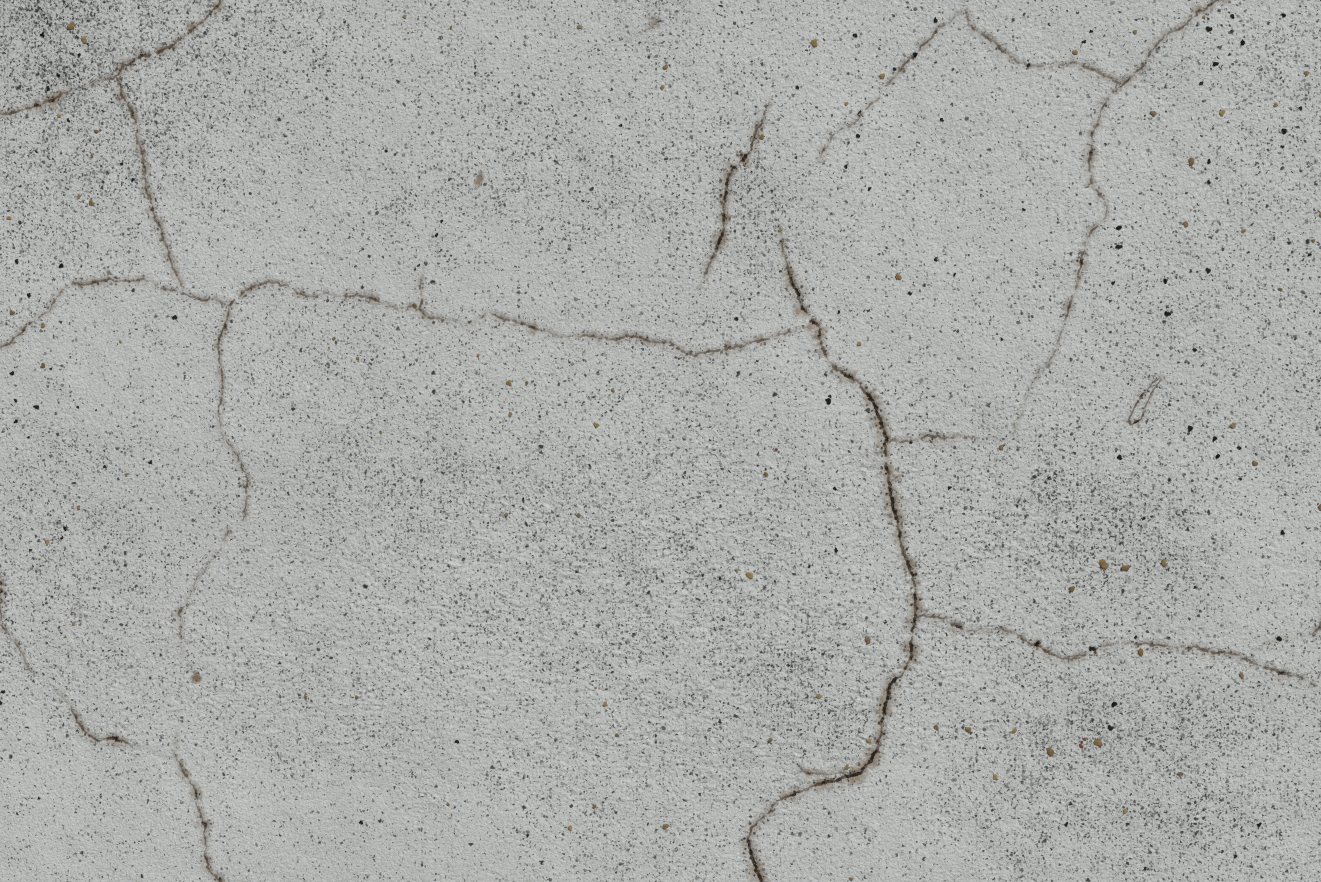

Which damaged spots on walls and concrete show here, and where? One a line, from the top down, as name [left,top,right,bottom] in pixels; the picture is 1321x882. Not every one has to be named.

crack [859,30,937,117]
crack [0,0,308,405]
crack [704,111,765,274]
crack [967,0,1218,340]
crack [344,285,442,322]
crack [494,314,545,331]
crack [1129,379,1159,425]
crack [583,239,1097,882]
crack [0,576,30,670]
crack [1134,641,1315,686]
crack [71,709,128,745]
crack [180,763,223,882]